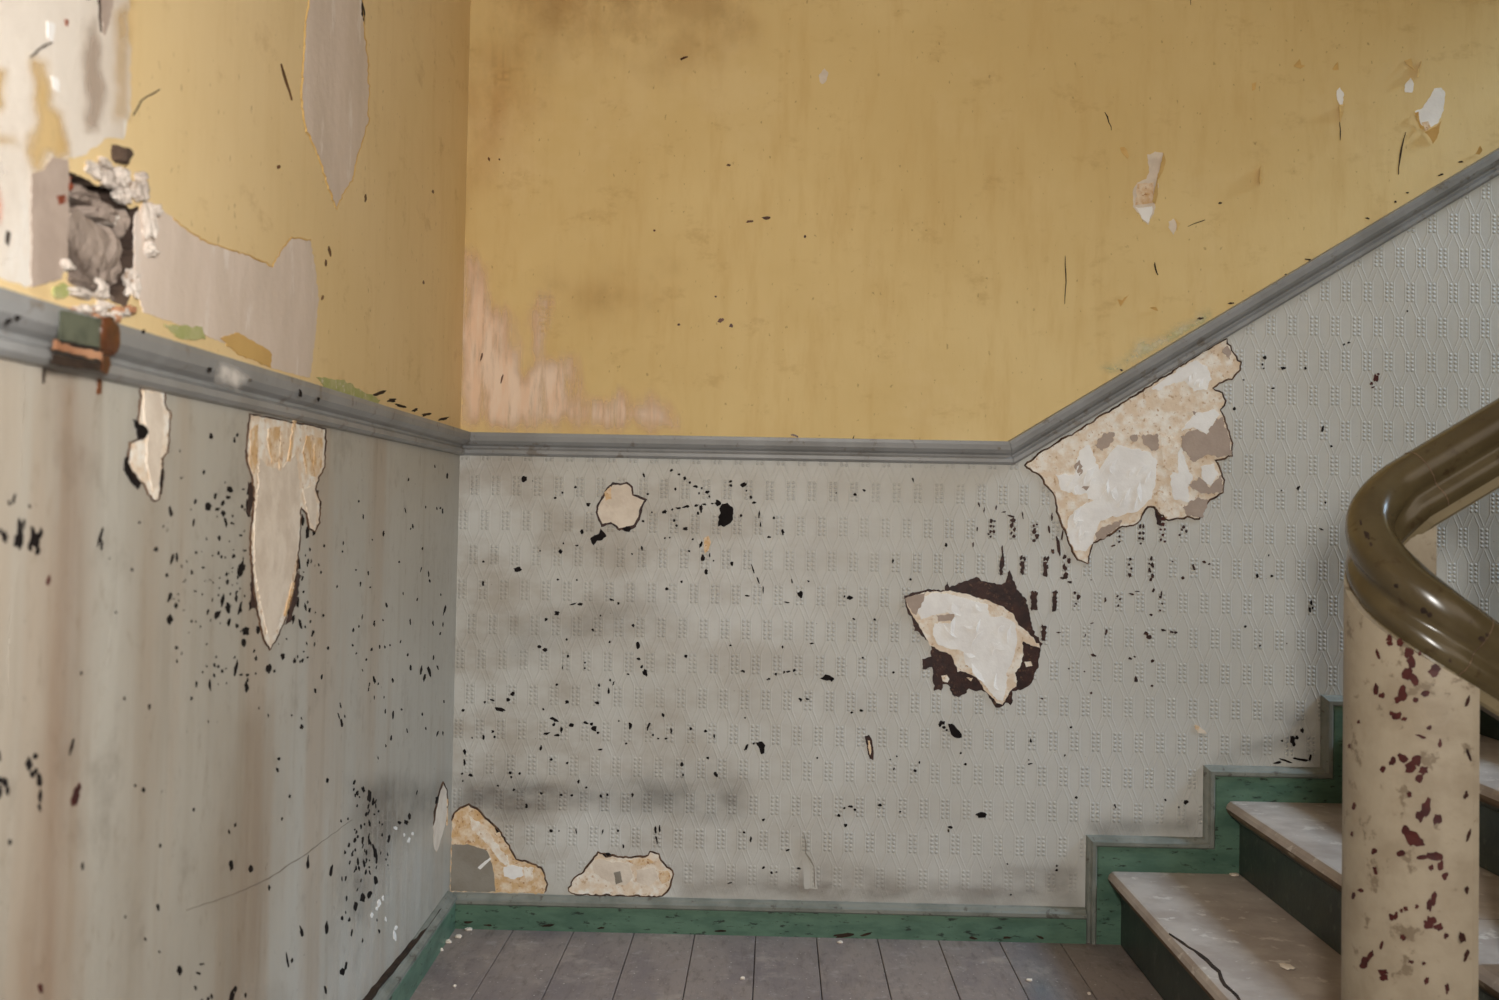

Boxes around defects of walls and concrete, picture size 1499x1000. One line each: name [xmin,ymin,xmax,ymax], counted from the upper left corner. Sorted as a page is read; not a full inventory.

peeling [1404,59,1445,143]
peeling [0,0,449,421]
peeling [462,259,670,427]
spalling [0,493,43,555]
peeling [123,388,329,700]
spalling [623,469,785,575]
spalling [352,602,444,759]
spalling [539,638,602,764]
spalling [594,624,647,704]
peeling [433,730,496,852]
spalling [325,780,411,943]
crack [1169,933,1241,1000]